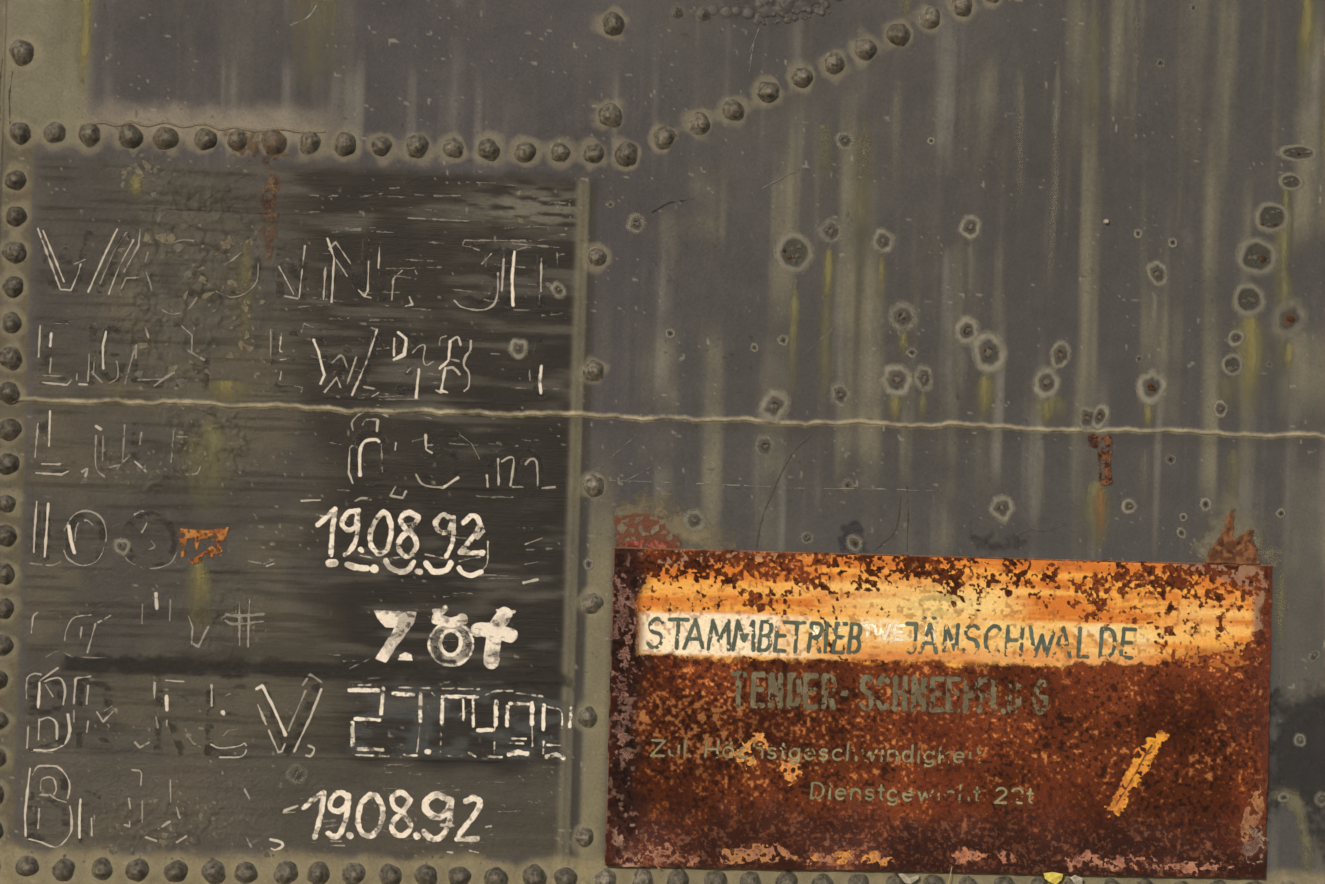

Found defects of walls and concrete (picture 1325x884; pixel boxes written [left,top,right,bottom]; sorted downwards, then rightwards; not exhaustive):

peeling [117,149,268,389]
corrosion [1088,434,1113,486]
corrosion [180,527,229,564]
corrosion [1205,509,1261,565]
leakage [1267,689,1325,868]